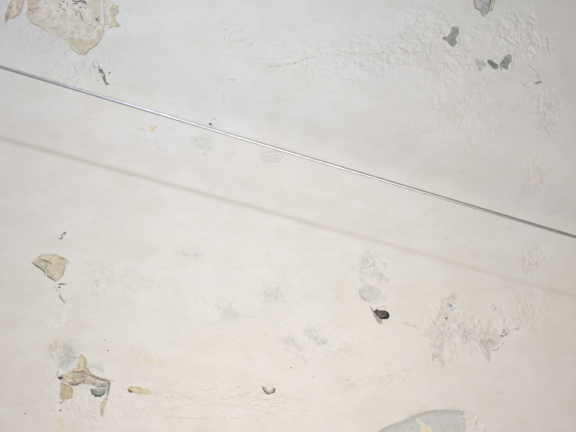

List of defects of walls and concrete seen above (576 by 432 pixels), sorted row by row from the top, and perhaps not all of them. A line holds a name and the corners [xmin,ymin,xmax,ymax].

spalling [474,0,495,17]
spalling [4,0,121,56]
spalling [443,26,459,46]
spalling [476,54,512,71]
spalling [30,254,69,282]
spalling [359,282,390,324]
peeling [424,297,506,369]
spalling [48,355,113,417]
spalling [128,386,162,397]
spalling [378,409,475,432]